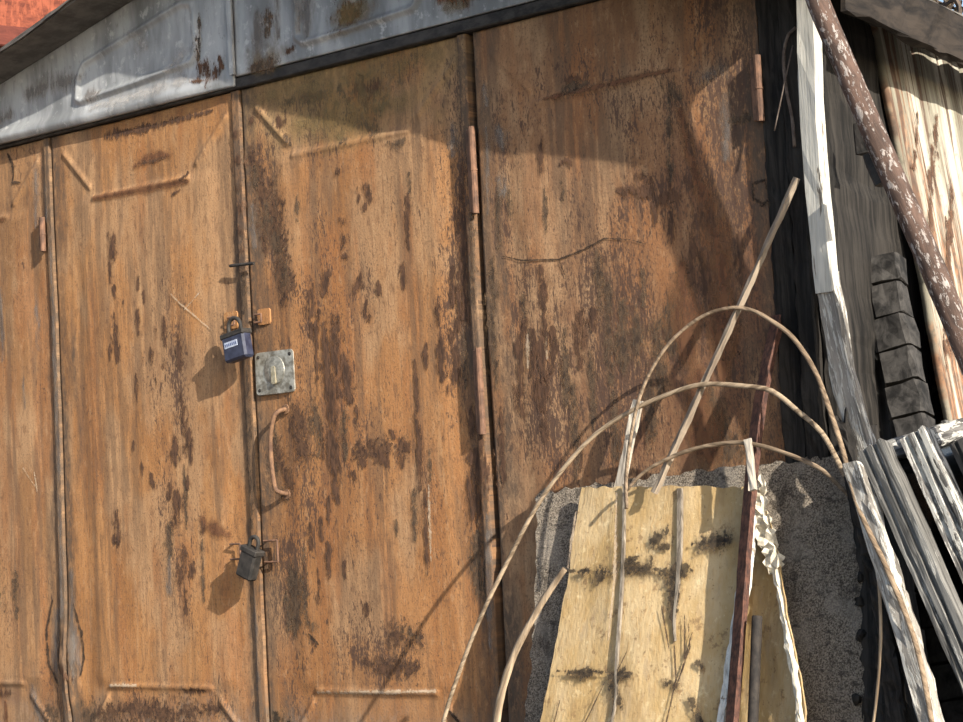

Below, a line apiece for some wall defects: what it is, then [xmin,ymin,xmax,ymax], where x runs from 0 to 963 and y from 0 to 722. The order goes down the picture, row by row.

corrosion [191,13,224,89]
corrosion [107,231,124,365]
corrosion [134,274,145,335]
corrosion [92,171,189,201]
corrosion [104,109,213,140]
corrosion [353,271,382,322]
crack [503,238,646,275]
corrosion [461,96,750,525]
corrosion [927,114,955,278]
corrosion [163,393,230,614]
corrosion [303,266,360,605]
corrosion [412,303,461,576]